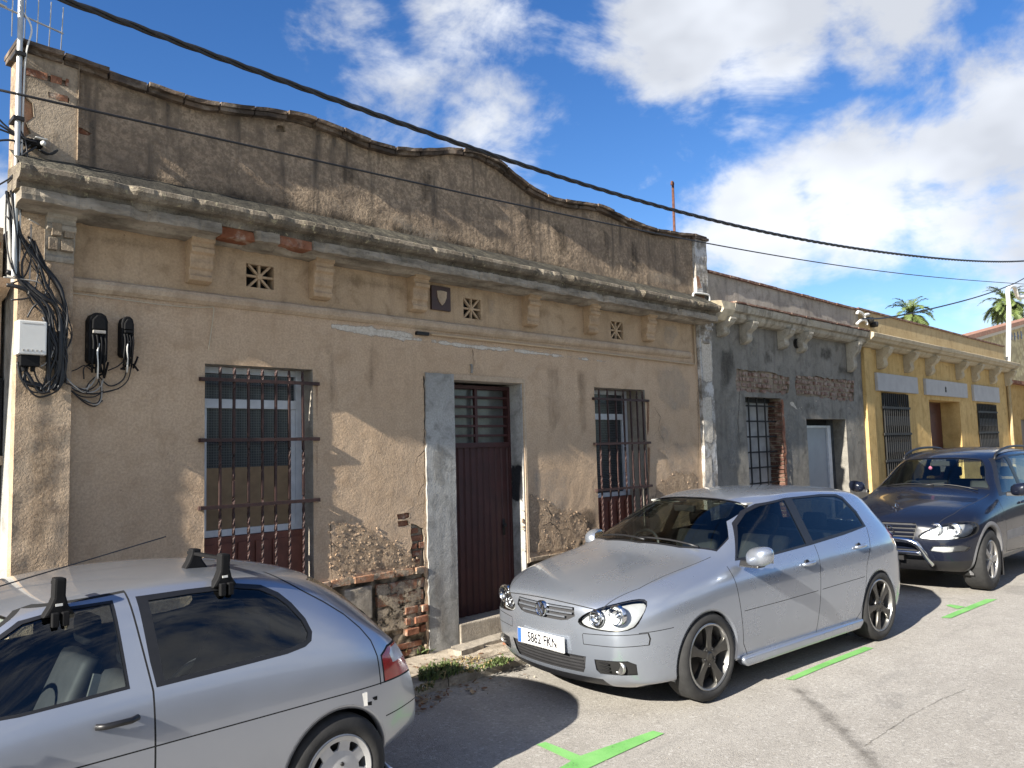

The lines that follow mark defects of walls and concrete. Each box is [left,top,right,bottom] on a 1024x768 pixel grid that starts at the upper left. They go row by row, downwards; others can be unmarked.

flaking render [216,226,255,245]
flaking render [736,369,854,485]
flaking render [322,513,428,659]
peeling [521,493,589,567]